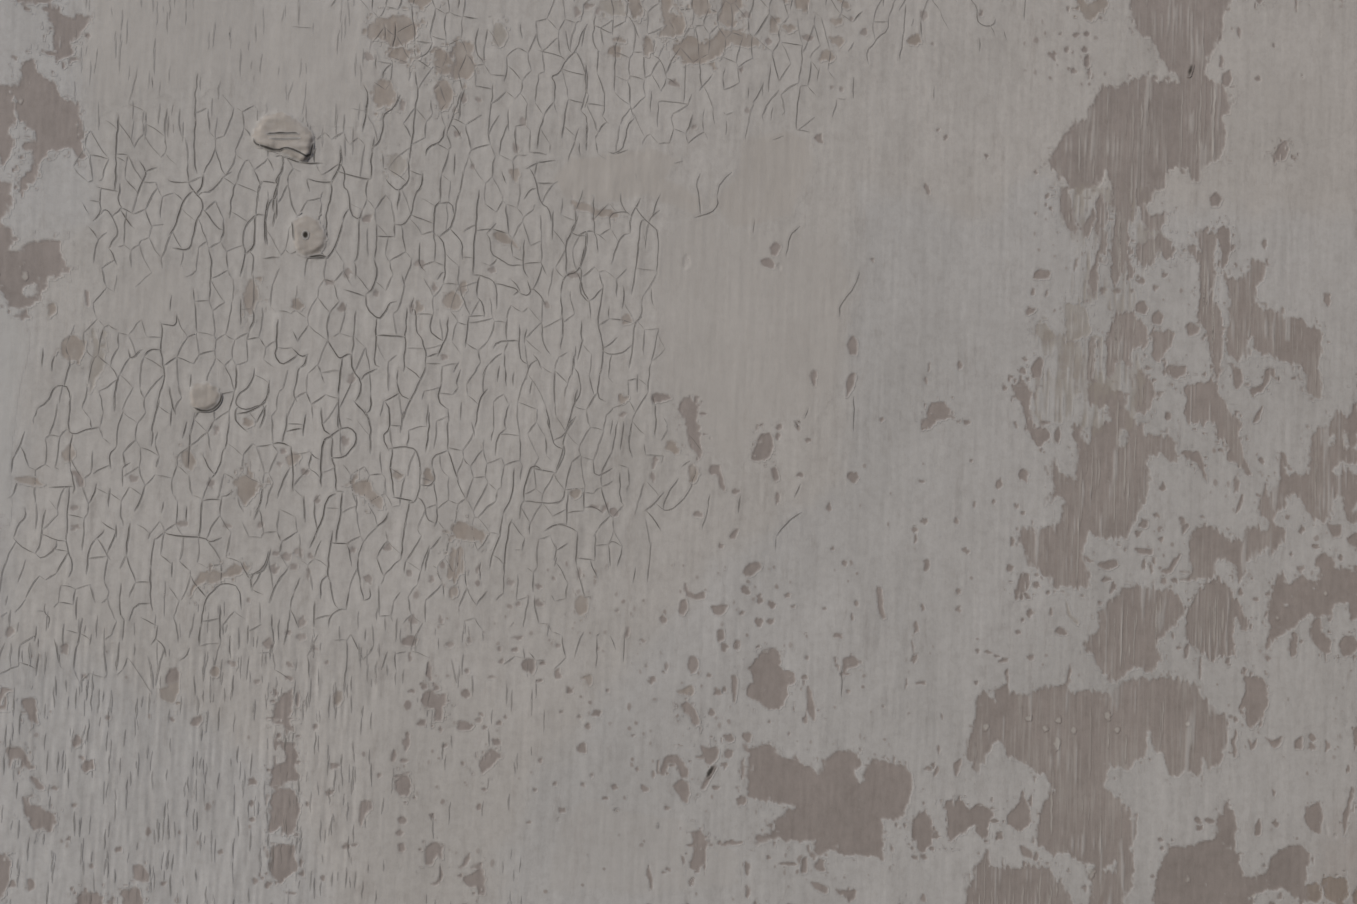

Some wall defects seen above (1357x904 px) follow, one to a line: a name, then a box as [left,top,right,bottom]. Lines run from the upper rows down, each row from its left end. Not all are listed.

peeling [0,0,100,321]
crack [0,0,1026,904]
peeling [650,0,1357,904]
peeling [0,851,23,903]
peeling [0,685,64,842]